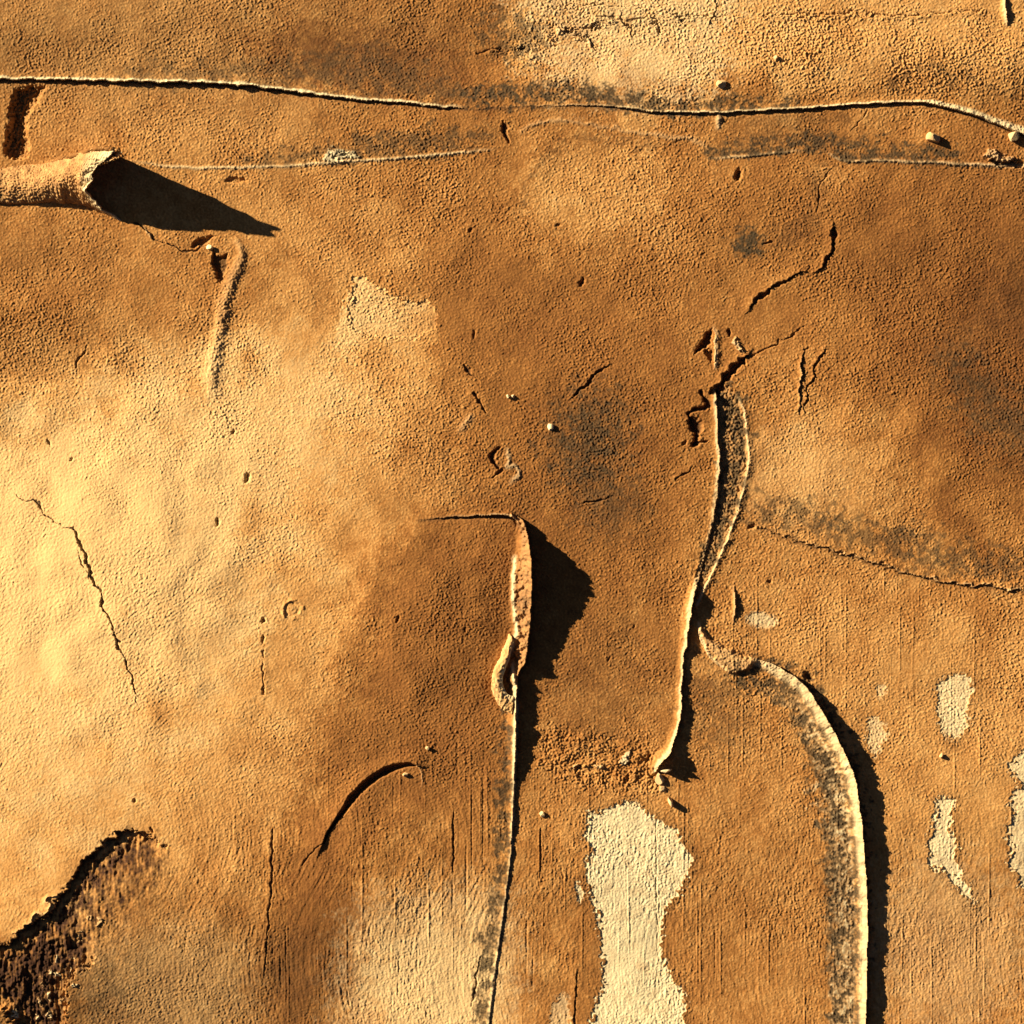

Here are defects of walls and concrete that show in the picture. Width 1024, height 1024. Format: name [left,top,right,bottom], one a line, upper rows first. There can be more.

peeling [0,74,495,221]
crack [500,120,511,145]
crack [849,108,869,133]
crack [749,167,842,311]
crack [674,325,827,481]
crack [12,490,140,712]
peeling [425,379,870,1024]
peeling [932,672,975,745]
spalling [0,797,190,1024]
crack [263,761,424,975]
peeling [924,794,978,910]
peeling [1001,749,1024,891]